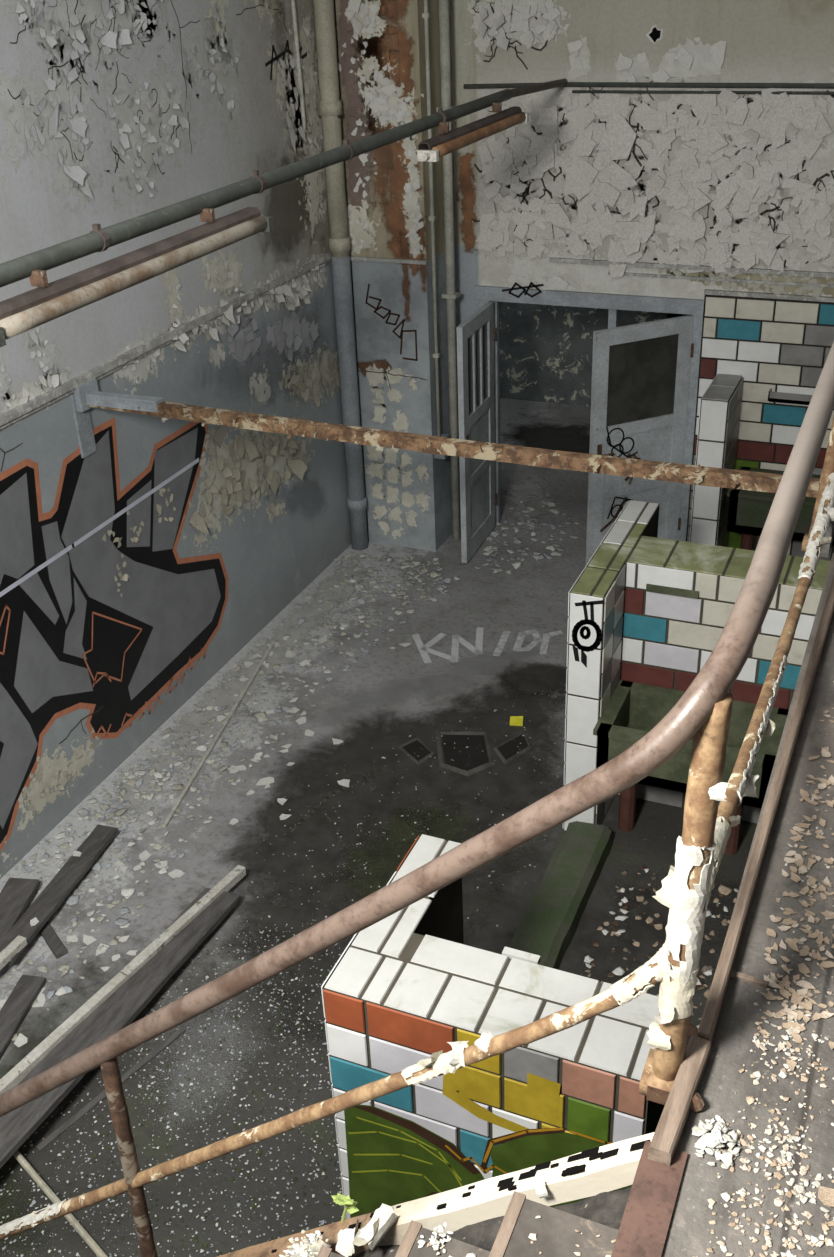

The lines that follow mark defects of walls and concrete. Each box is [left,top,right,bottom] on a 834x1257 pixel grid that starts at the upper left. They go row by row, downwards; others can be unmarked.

peeling [0,0,324,222]
peeling [338,0,426,258]
rust [357,0,427,320]
peeling [464,0,834,297]
crack [0,443,23,472]
peeling [102,426,315,597]
peeling [109,168,340,420]
flaking render [366,363,419,433]
flaking render [366,446,431,539]
leakage [228,664,567,955]
leakage [271,934,355,1036]